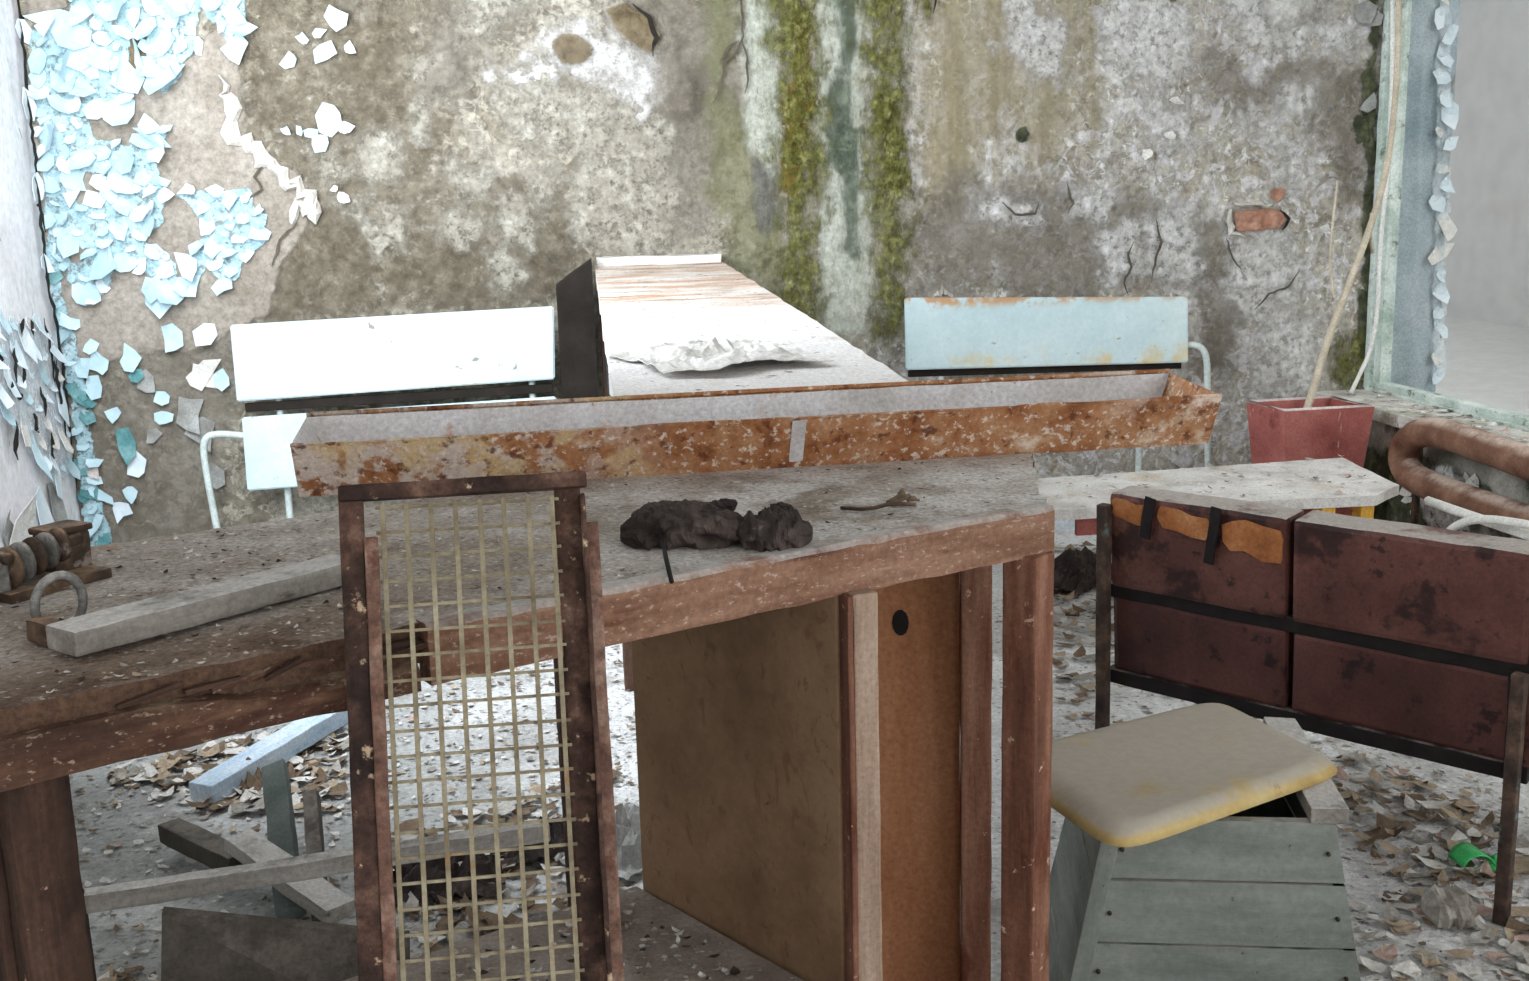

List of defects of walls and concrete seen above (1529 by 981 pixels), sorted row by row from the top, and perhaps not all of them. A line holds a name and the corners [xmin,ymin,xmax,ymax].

flaking render [552,33,592,64]
flaking render [607,3,660,57]
damp [816,0,875,334]
flaking render [1226,188,1291,238]
flaking render [0,0,356,547]